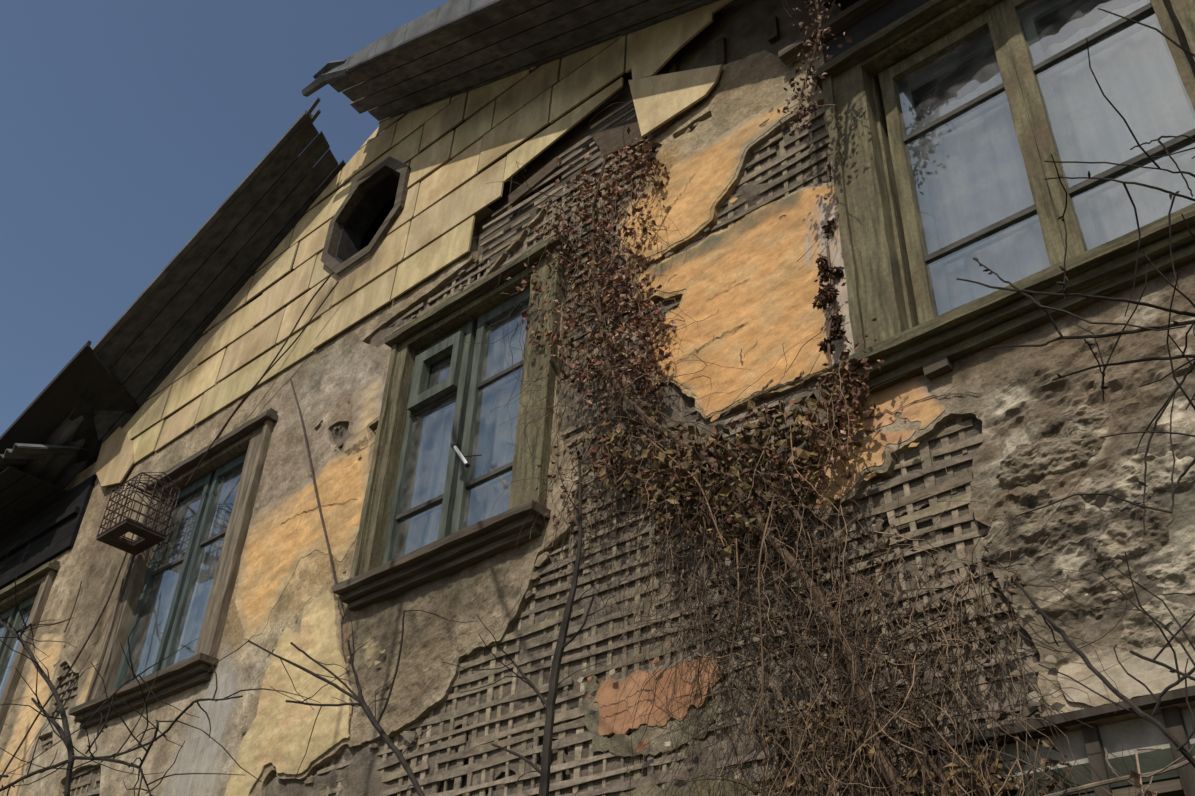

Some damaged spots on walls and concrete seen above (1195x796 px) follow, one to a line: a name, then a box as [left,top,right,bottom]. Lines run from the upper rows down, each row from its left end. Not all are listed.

crack [644,173,695,250]
crack [678,322,757,362]
crack [723,361,840,416]
flaking render [225,96,1195,796]
crack [282,491,351,524]